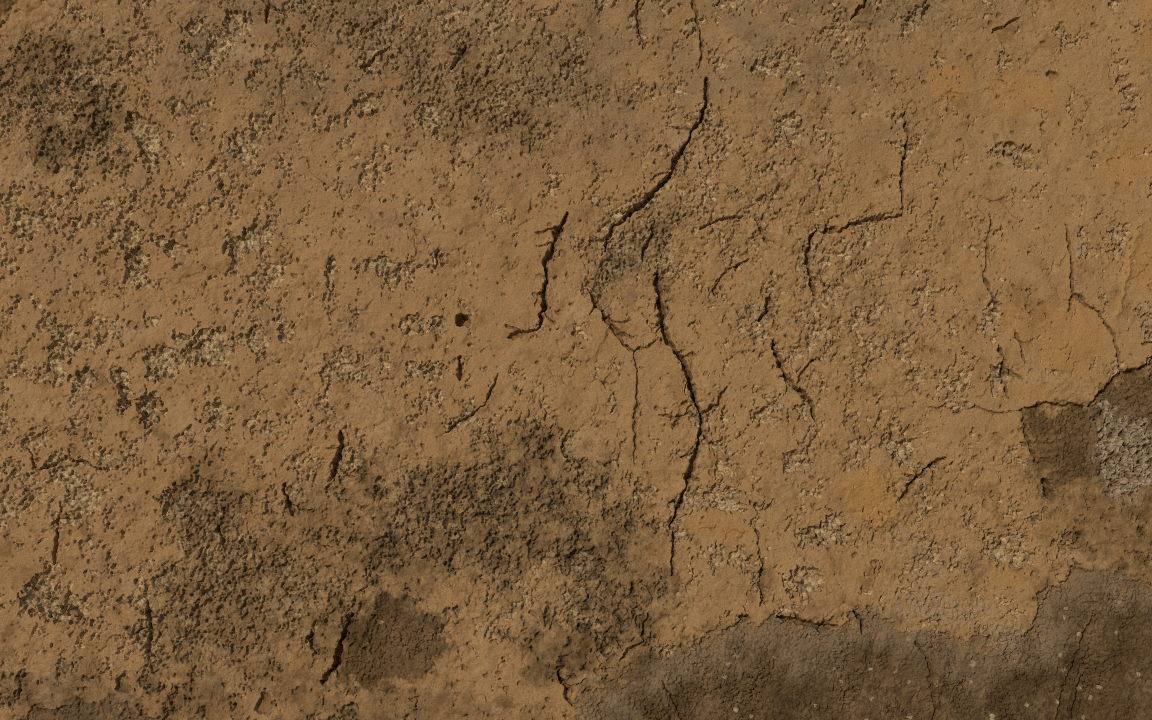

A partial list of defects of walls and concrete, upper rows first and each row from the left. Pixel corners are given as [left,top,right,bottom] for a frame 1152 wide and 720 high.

crack [505,0,729,576]
crack [699,215,769,296]
crack [757,293,817,422]
crack [804,113,910,297]
crack [926,214,1152,463]
spalling [17,574,92,627]
crack [738,525,864,635]